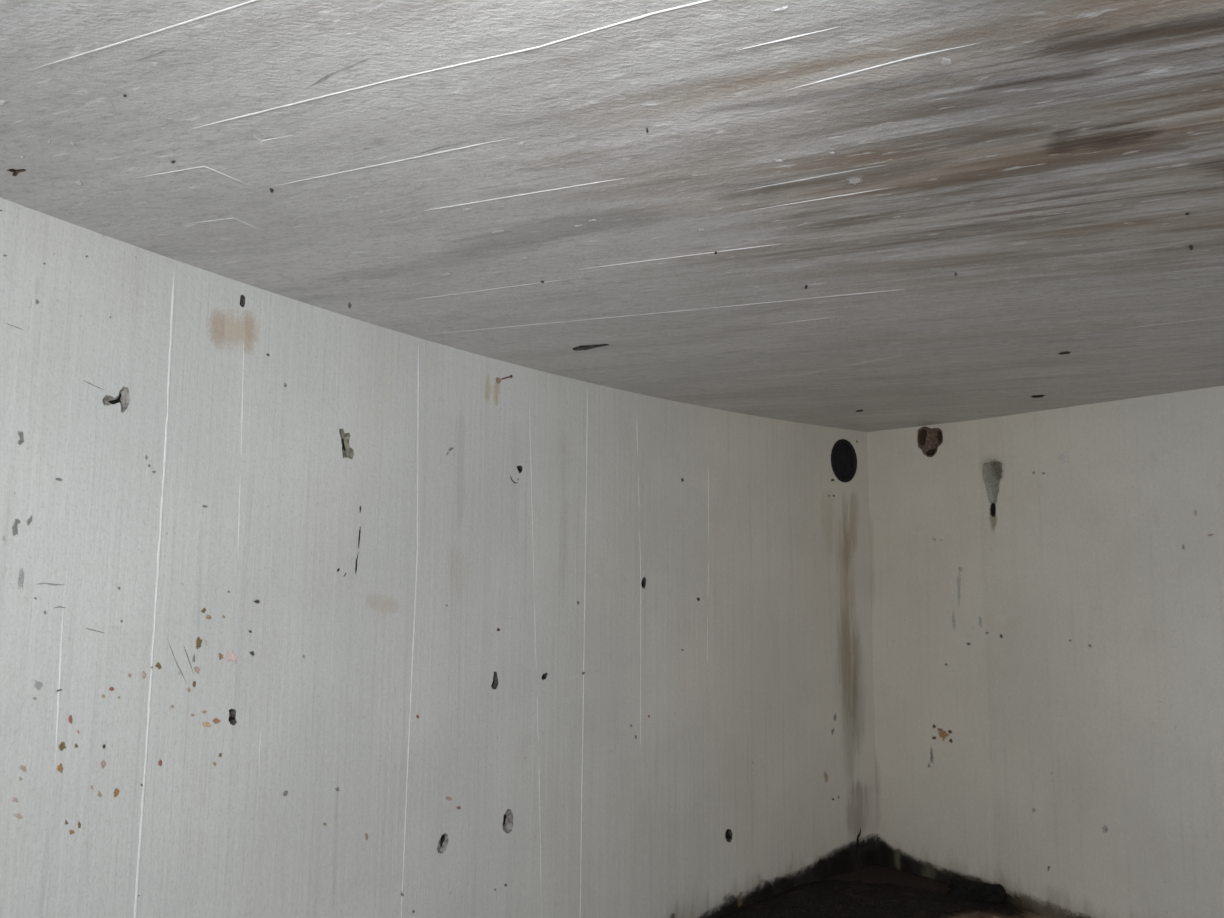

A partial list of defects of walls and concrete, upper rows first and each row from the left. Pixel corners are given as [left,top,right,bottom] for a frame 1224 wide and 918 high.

spalling [103,387,130,413]
spalling [917,426,943,457]